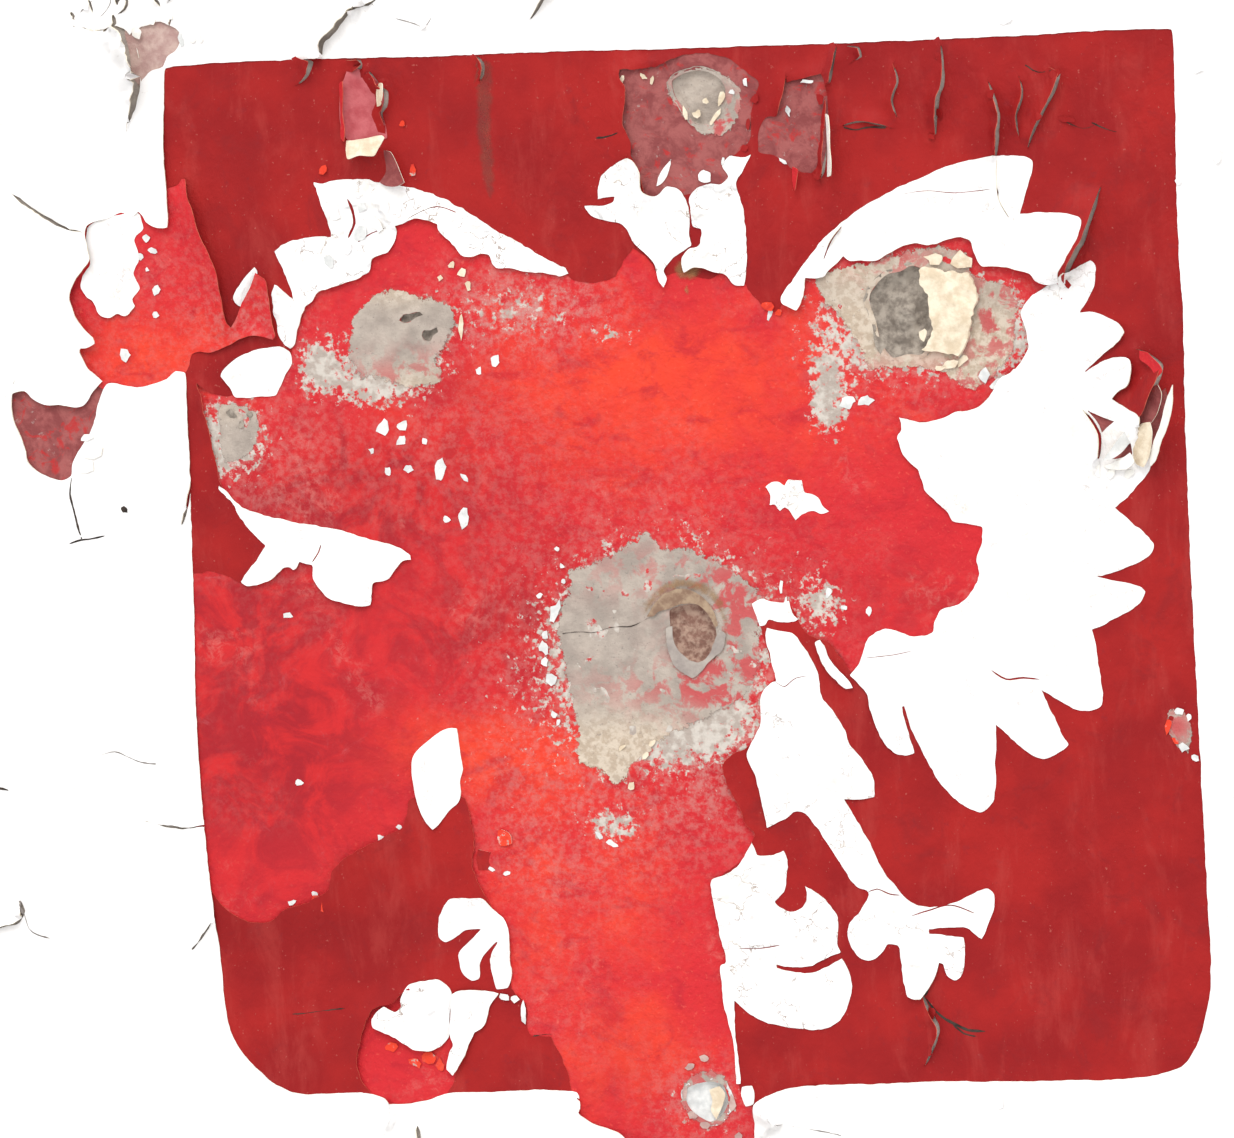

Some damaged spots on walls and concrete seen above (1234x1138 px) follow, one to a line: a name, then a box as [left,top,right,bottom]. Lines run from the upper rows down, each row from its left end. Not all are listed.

peeling [58,0,203,132]
peeling [339,68,416,187]
peeling [504,0,540,19]
peeling [619,53,832,196]
peeling [915,45,942,139]
peeling [6,179,275,480]
peeling [1077,348,1173,480]
peeling [193,214,1045,1138]